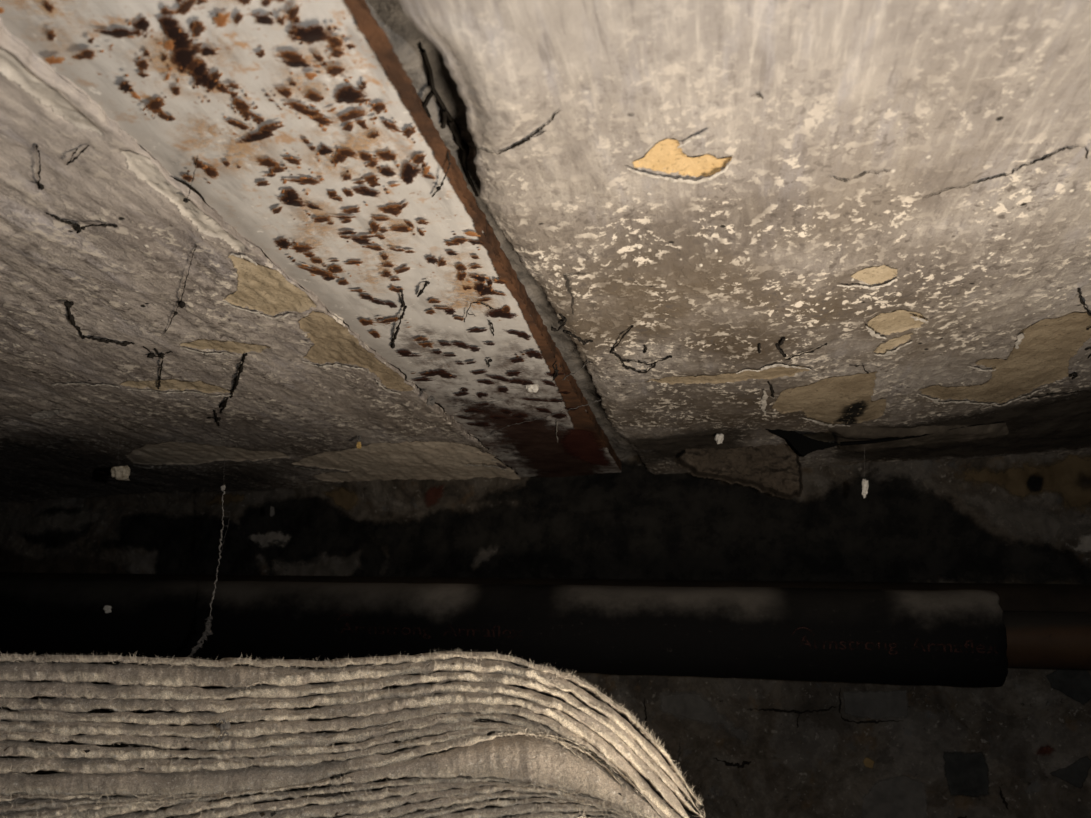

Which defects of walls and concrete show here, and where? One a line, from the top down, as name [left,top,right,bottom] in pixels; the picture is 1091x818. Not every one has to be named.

corrosion [34,0,66,41]
crack [421,49,561,197]
peeling [627,130,733,184]
crack [924,146,1089,198]
crack [1,26,518,475]
peeling [120,150,415,395]
corrosion [45,0,621,477]
crack [564,273,594,315]
peeling [837,265,898,290]
peeling [865,309,928,356]
peeling [647,364,887,442]
leakage [101,462,1091,584]